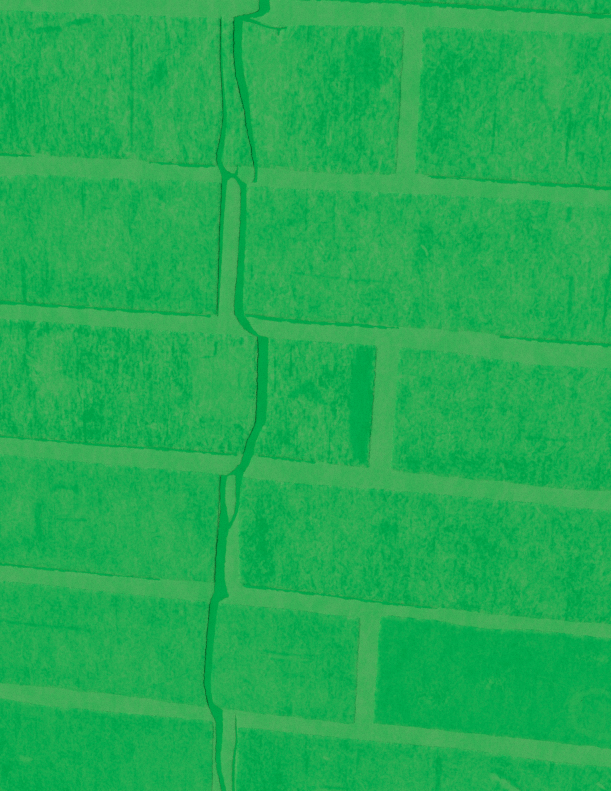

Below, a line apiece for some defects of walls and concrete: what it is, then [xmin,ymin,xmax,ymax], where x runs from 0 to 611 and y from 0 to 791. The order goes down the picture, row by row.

crack [0,0,438,791]